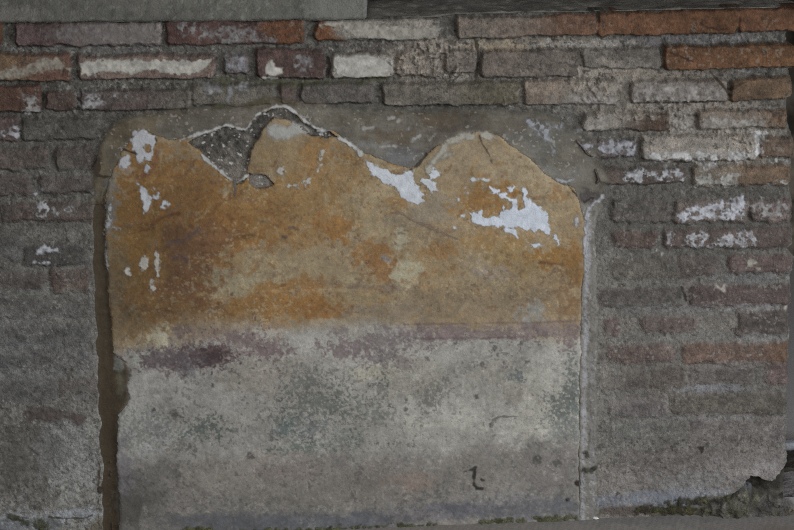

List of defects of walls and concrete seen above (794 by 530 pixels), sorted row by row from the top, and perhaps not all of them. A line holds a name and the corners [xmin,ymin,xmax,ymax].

peeling [118,129,156,173]
spalling [188,108,337,188]
efflorescence [581,139,636,157]
peeling [366,131,494,205]
efflorescence [623,165,684,183]
efflorescence [694,173,741,188]
peeling [136,183,171,214]
efflorescence [676,195,788,223]
peeling [104,196,121,270]
efflorescence [686,230,757,248]
peeling [124,251,160,291]